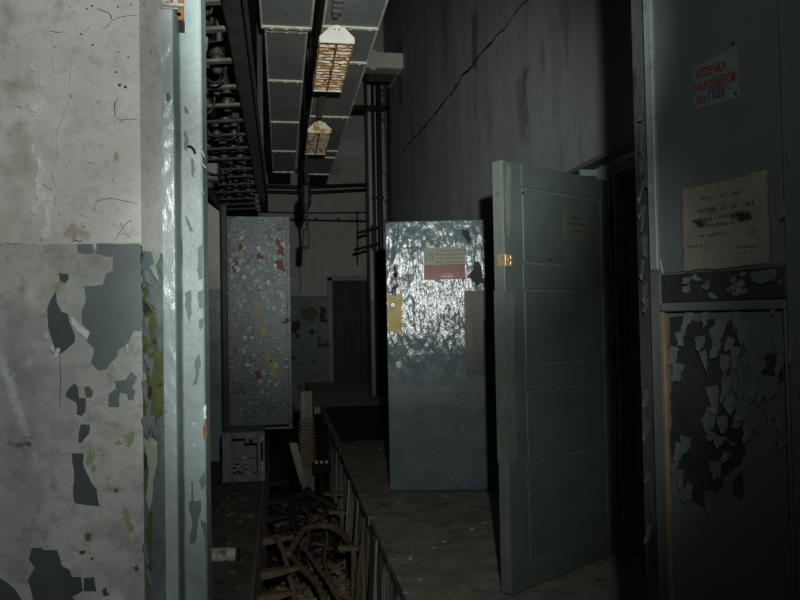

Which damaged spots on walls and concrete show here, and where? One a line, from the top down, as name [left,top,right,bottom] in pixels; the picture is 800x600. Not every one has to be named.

crack [395,0,528,160]
peeling [682,273,718,299]
peeling [726,268,782,296]
peeling [44,243,164,600]
peeling [667,310,800,517]
peeling [0,578,22,600]
peeling [28,548,110,600]